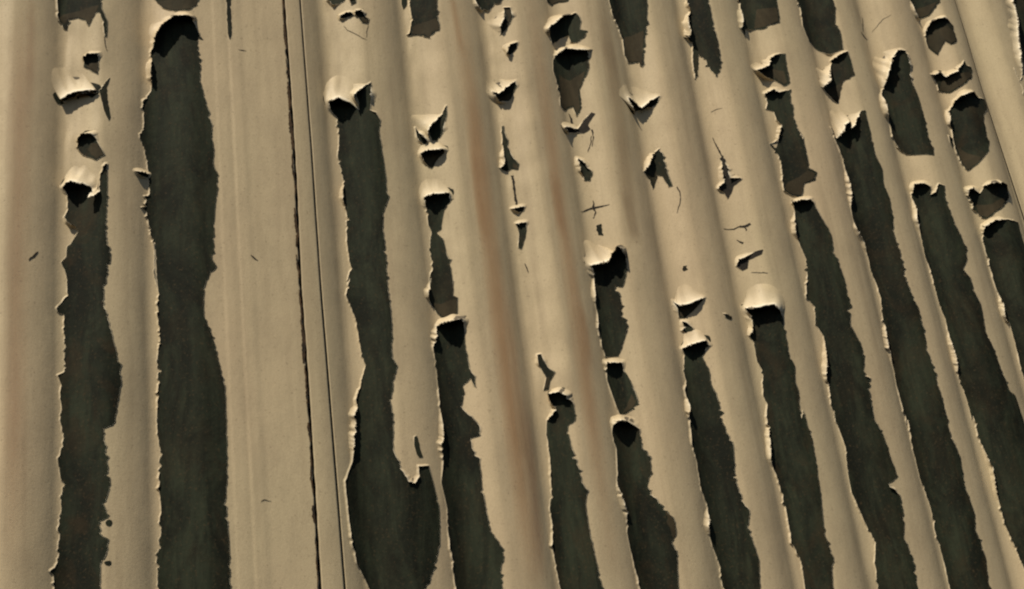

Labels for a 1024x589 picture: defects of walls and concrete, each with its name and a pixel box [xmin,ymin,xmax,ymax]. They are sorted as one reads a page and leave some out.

peeling [543,0,593,117]
peeling [608,0,650,69]
peeling [48,130,123,589]
peeling [132,0,233,589]
peeling [323,75,505,589]
peeling [535,352,605,589]
peeling [582,223,680,589]
peeling [670,284,762,589]
peeling [722,284,835,589]
peeling [751,52,919,589]
peeling [796,0,992,589]
peeling [909,179,1024,572]